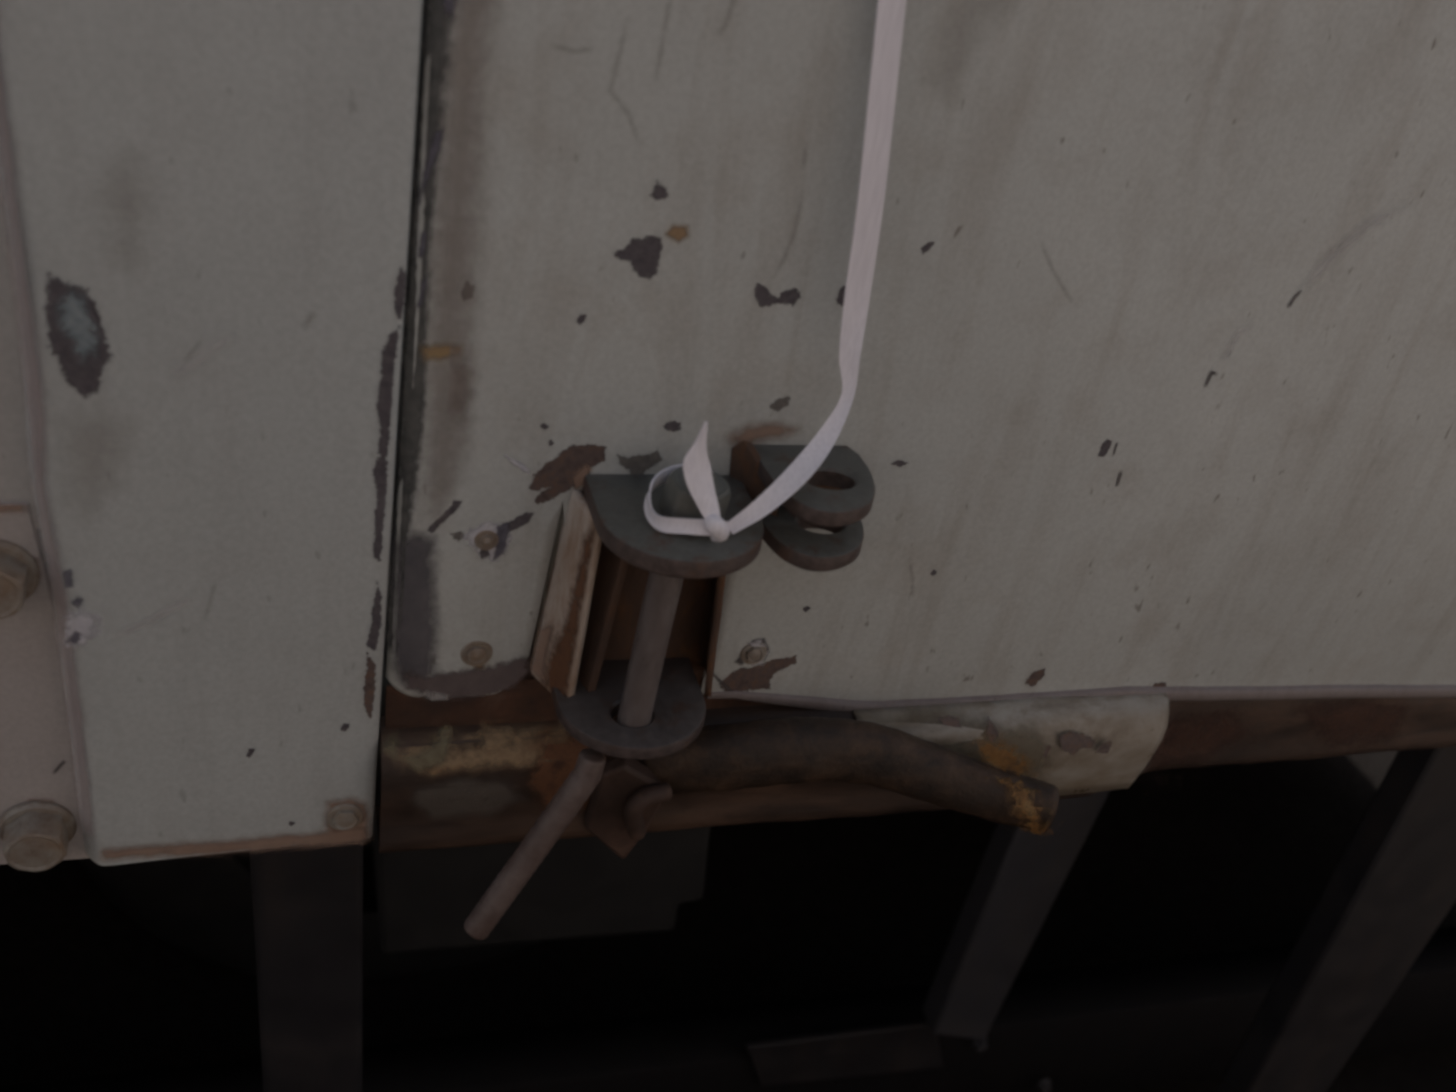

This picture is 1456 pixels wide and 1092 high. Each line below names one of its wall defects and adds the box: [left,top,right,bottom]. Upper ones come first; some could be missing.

peeling [43,272,113,398]
peeling [614,235,663,280]
peeling [755,283,801,307]
peeling [372,267,427,561]
peeling [428,444,662,560]
peeling [63,570,100,645]
peeling [363,581,382,718]
corrosion [385,725,569,776]